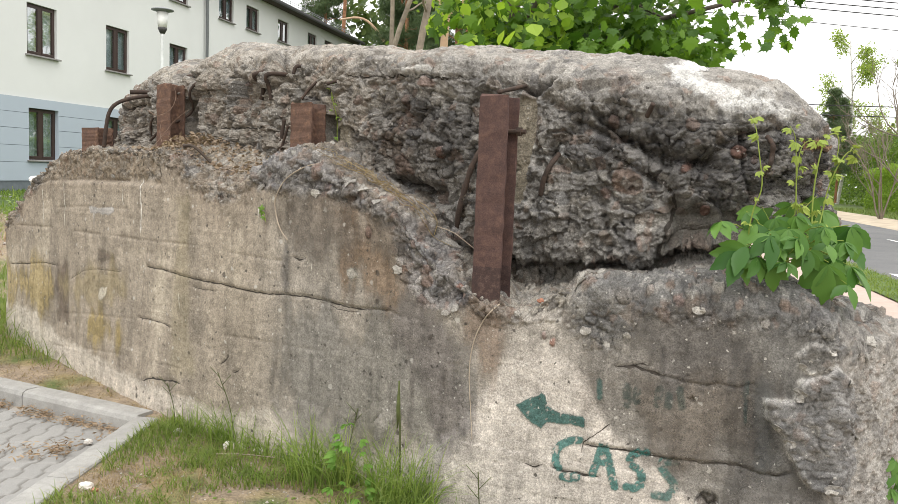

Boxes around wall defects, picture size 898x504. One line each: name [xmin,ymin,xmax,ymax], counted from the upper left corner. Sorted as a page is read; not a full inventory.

spalling [35,148,162,181]
damp [258,185,408,289]
spalling [249,144,472,316]
damp [7,254,68,321]
crack [147,266,397,314]
damp [271,290,476,466]
crack [615,363,683,382]
crack [525,463,598,477]
crack [582,422,790,477]